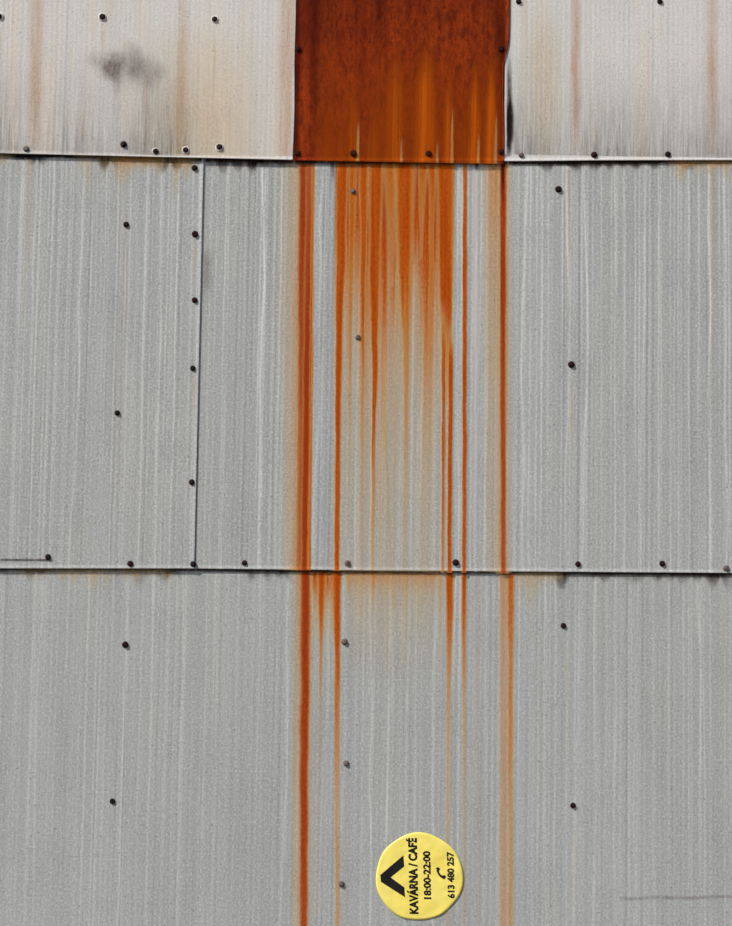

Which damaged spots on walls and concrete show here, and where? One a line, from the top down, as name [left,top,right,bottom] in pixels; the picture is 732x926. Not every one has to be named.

rust [294,56,514,926]